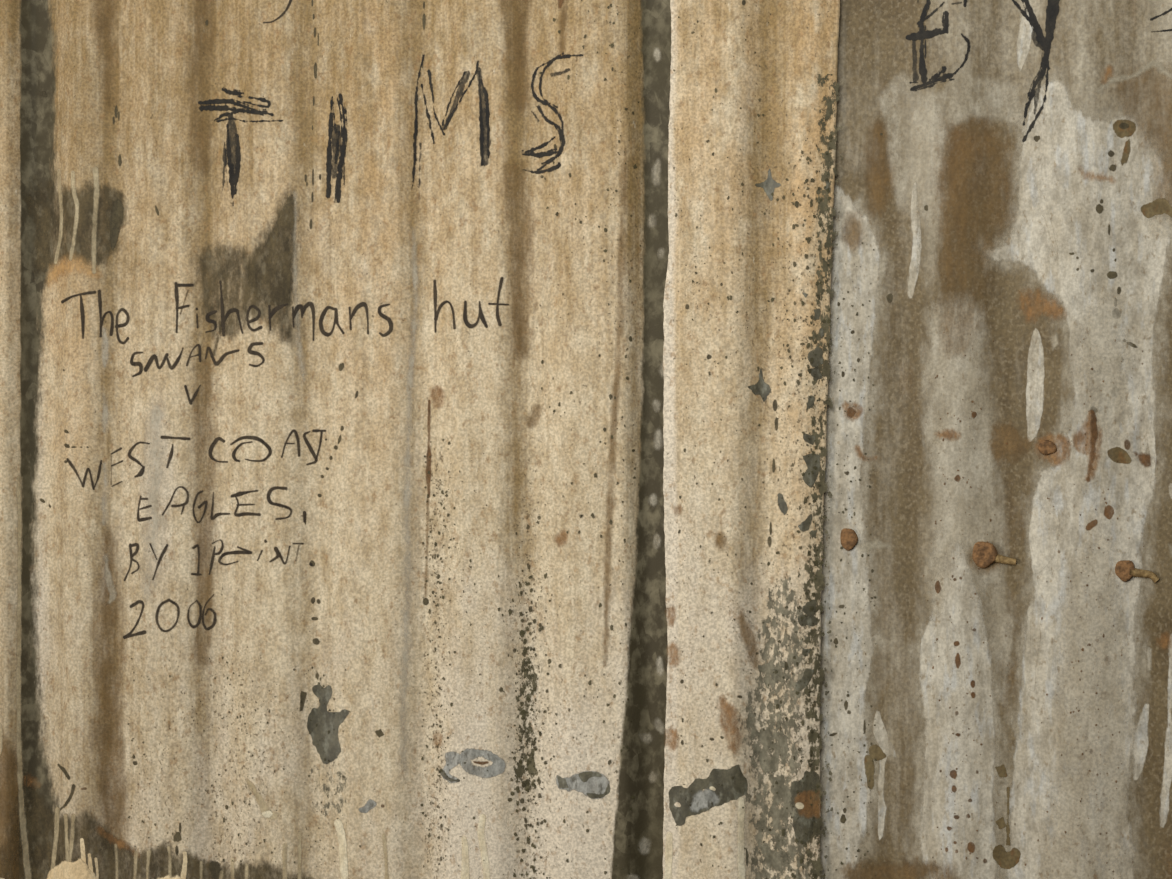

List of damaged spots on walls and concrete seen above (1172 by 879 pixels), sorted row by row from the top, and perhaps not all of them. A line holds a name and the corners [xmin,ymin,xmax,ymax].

peeling [669,74,896,879]
peeling [880,75,1172,879]
rust [991,410,1157,481]
leakage [419,439,488,866]
leakage [199,767,278,862]
leakage [248,667,350,762]
peeling [300,673,349,816]
peeling [440,748,505,783]
peeling [556,771,610,799]